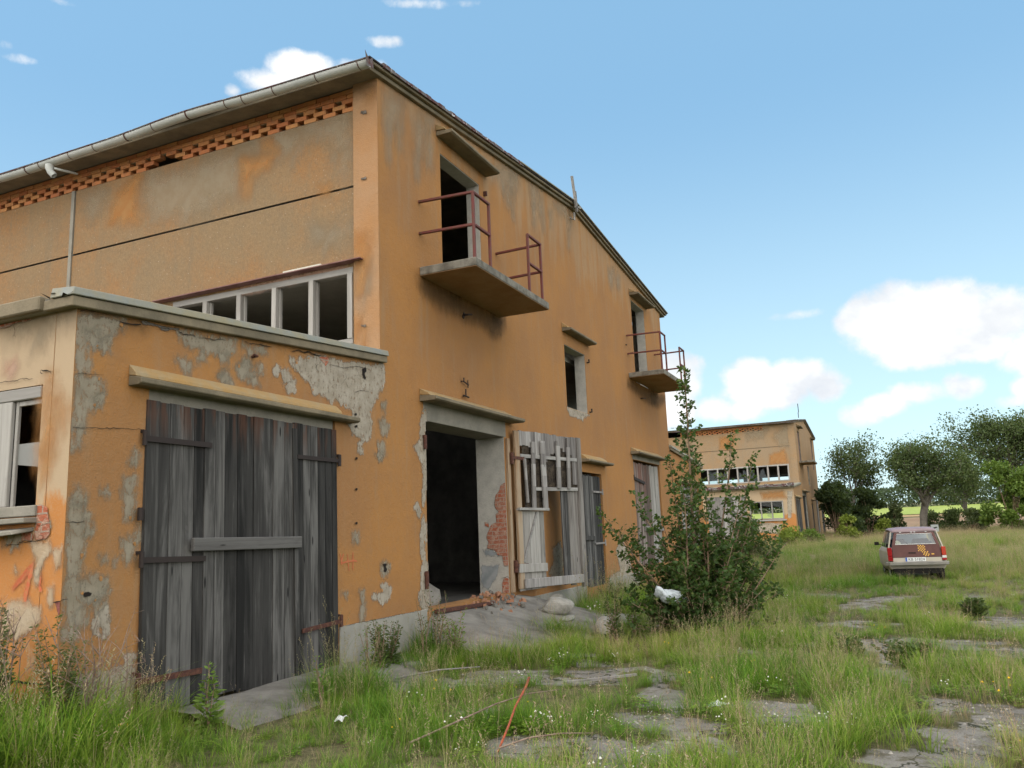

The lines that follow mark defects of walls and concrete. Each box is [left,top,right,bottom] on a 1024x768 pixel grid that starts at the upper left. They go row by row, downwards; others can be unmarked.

peeling [70,313,126,452]
peeling [141,321,390,460]
peeling [0,449,142,644]
peeling [344,561,392,622]
peeling [413,408,429,611]
flaking render [485,483,509,593]
peeling [70,652,137,717]